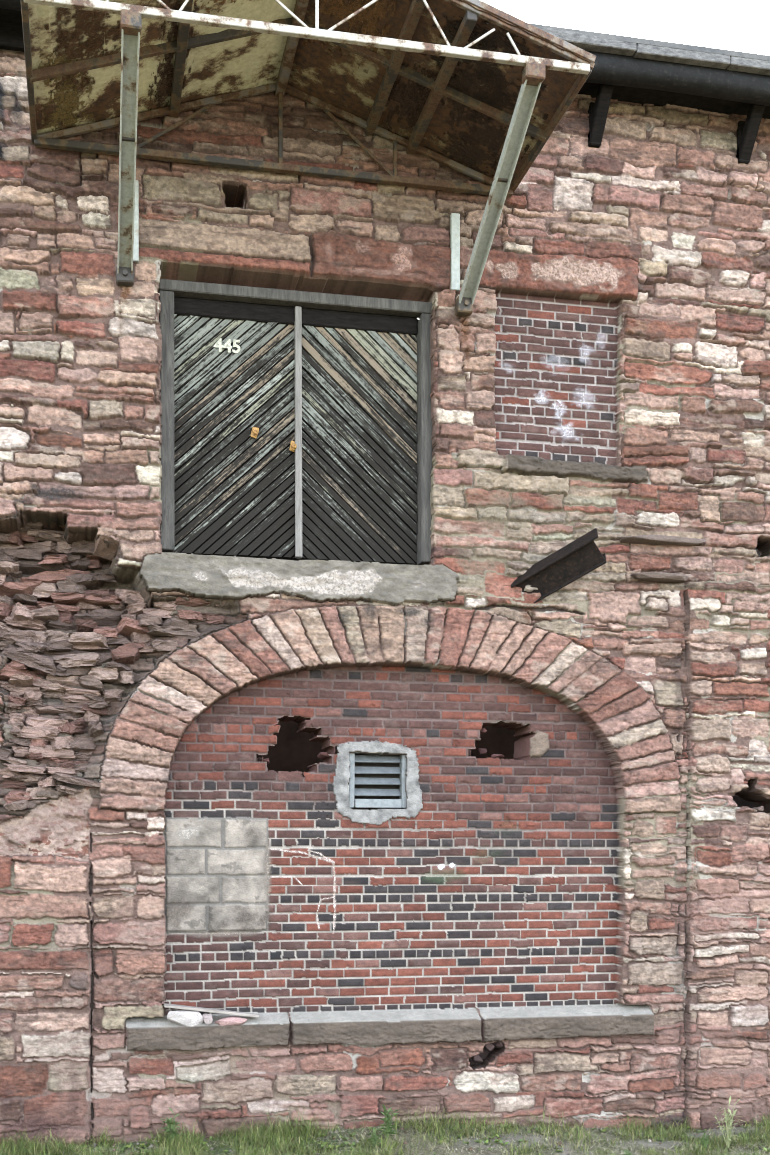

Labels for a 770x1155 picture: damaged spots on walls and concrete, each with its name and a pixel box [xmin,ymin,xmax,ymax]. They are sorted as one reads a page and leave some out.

corrosion [38,7,121,131]
corrosion [148,0,195,111]
corrosion [193,0,235,13]
corrosion [305,0,396,57]
peeling [222,568,382,597]
peeling [0,522,226,850]
hole [257,716,335,777]
hole [468,721,536,761]
hole [735,779,770,814]
hole [469,1041,506,1070]